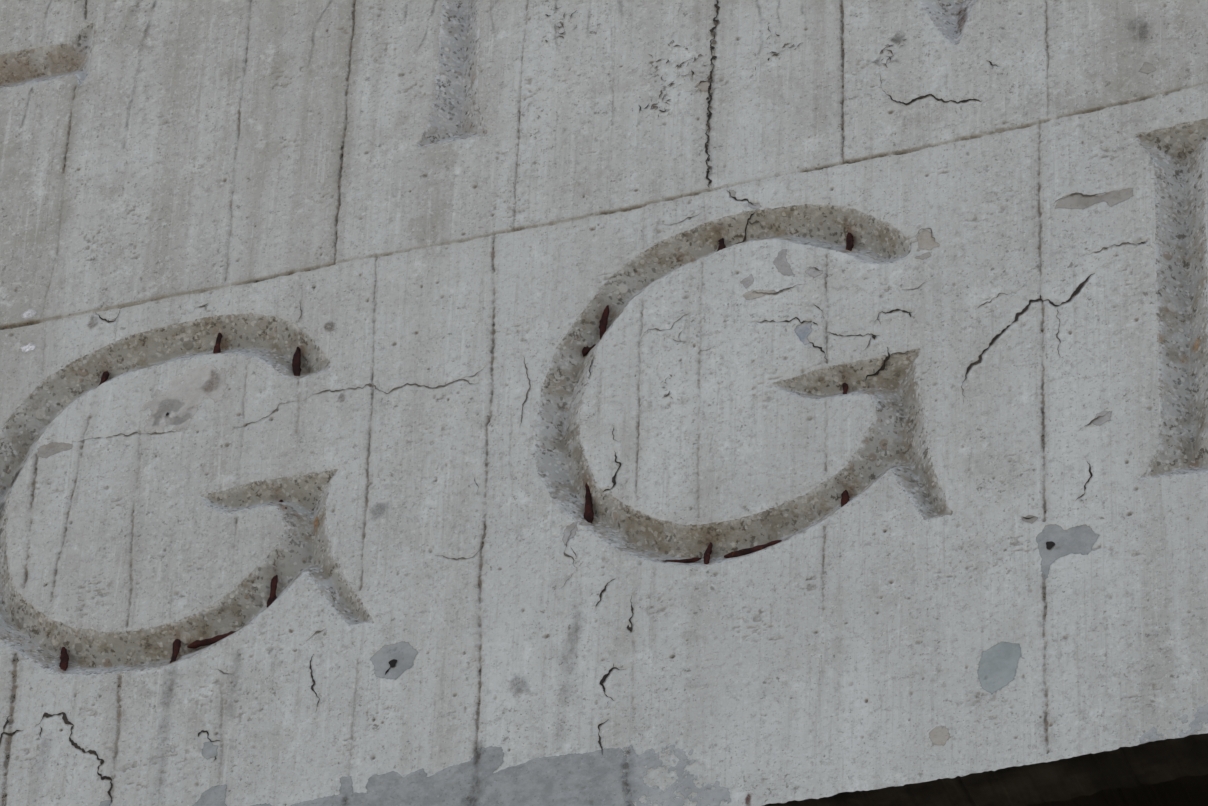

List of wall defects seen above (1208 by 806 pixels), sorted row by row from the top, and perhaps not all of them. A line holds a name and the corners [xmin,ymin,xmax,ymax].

crack [880,76,982,105]
rust [846,232,854,251]
rust [582,305,609,357]
crack [961,241,1147,396]
rust [292,347,302,376]
rust [583,483,594,523]
rust [841,490,850,507]
rust [661,540,782,565]
rust [267,575,278,607]
rust [59,647,69,671]
rust [169,631,236,664]
crack [0,712,113,802]